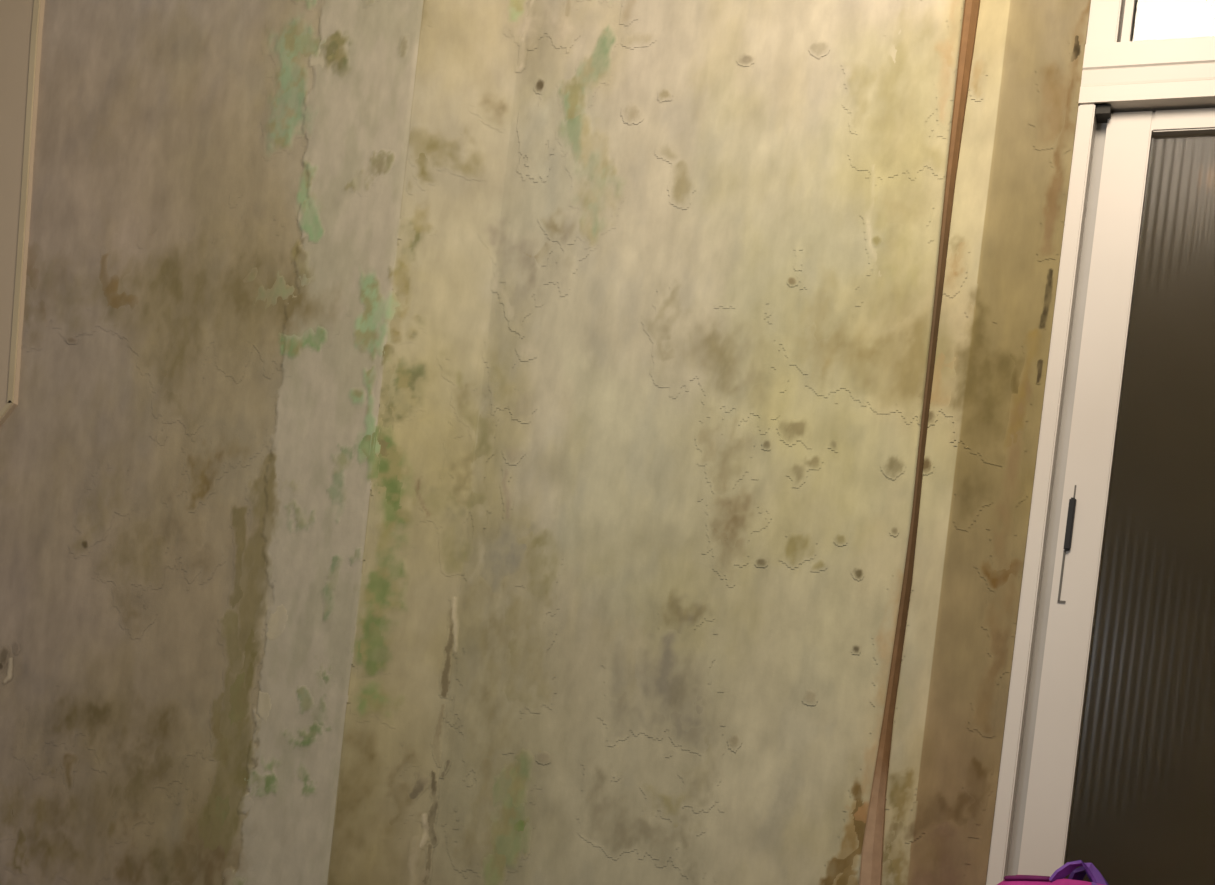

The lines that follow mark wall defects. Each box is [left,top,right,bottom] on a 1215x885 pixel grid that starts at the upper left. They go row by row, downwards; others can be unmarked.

damp [0,190,356,885]
peeling [243,0,438,885]
crack [409,606,454,884]
peeling [533,21,645,251]
damp [641,0,1025,587]
damp [900,754,994,885]